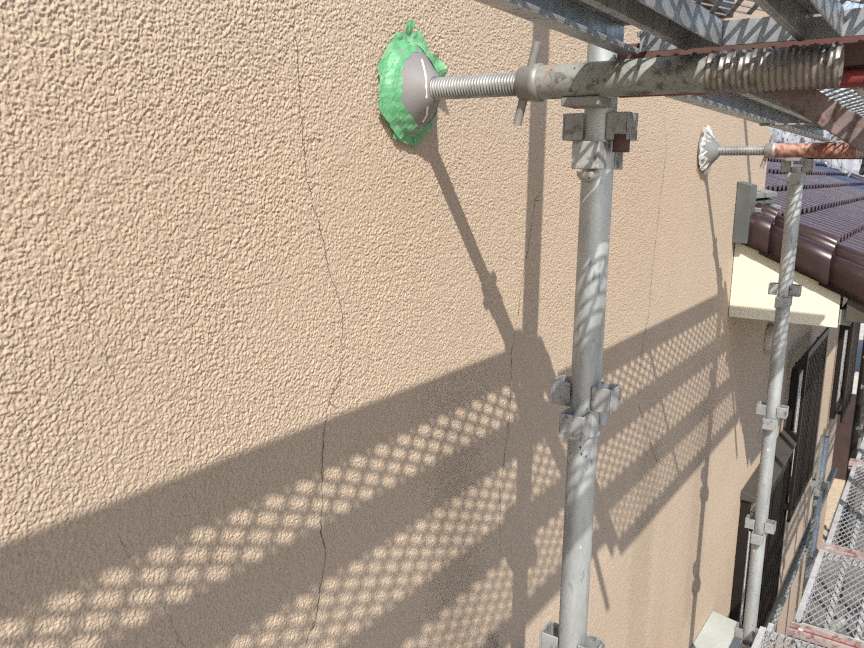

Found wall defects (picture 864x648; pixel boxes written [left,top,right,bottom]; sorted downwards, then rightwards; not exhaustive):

crack [293,27,343,641]